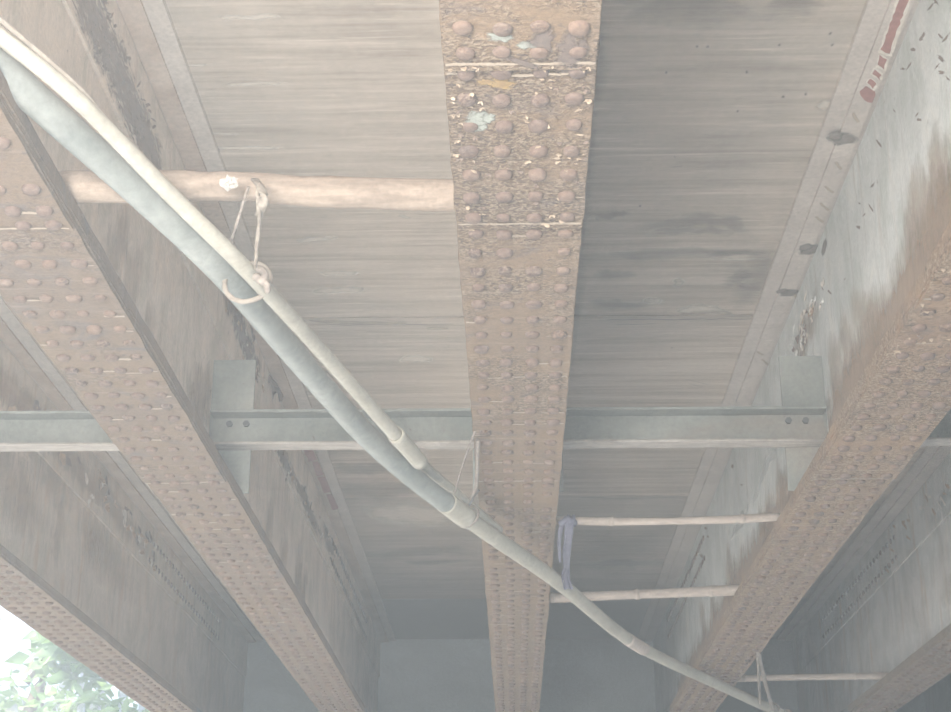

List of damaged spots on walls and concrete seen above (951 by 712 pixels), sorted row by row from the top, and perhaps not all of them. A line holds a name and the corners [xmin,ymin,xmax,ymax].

peeling [859,0,910,103]